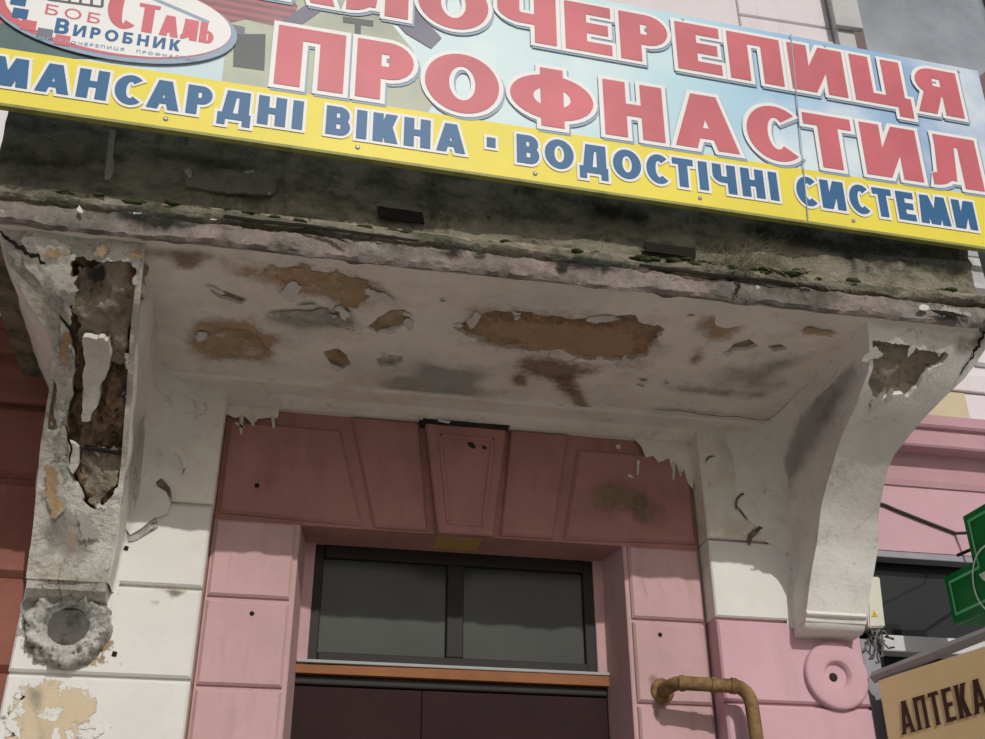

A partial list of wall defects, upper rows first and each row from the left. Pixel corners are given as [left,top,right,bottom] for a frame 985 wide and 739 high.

crack [0,231,46,265]
leakage [546,254,624,270]
leakage [751,226,972,270]
peeling [237,263,414,334]
crack [60,315,77,356]
peeling [189,322,278,363]
spalling [454,309,662,369]
crack [959,331,985,376]
flaking render [20,236,149,543]
spalling [862,341,945,412]
crack [64,424,73,464]
peeling [1,678,104,739]